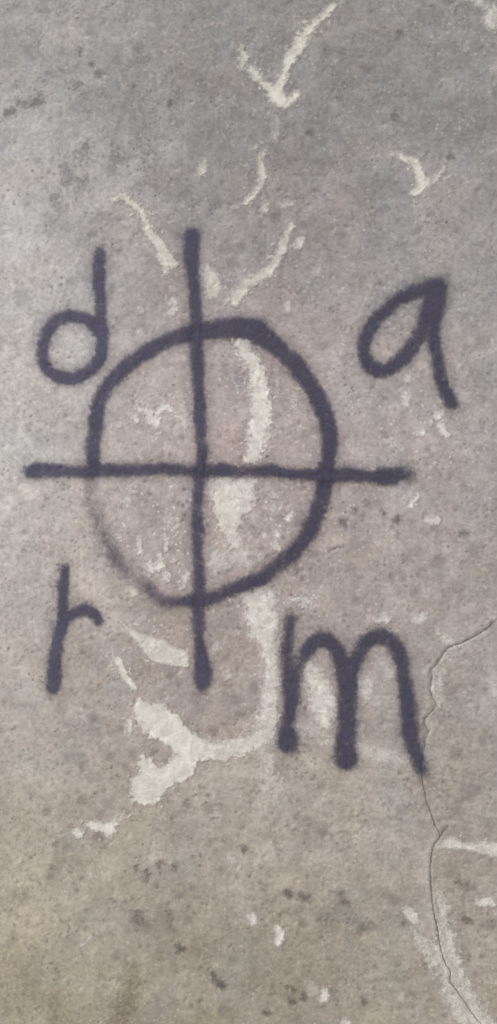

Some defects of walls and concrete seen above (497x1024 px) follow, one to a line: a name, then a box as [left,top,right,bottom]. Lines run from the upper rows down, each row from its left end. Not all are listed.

crack [421,620,497,1024]